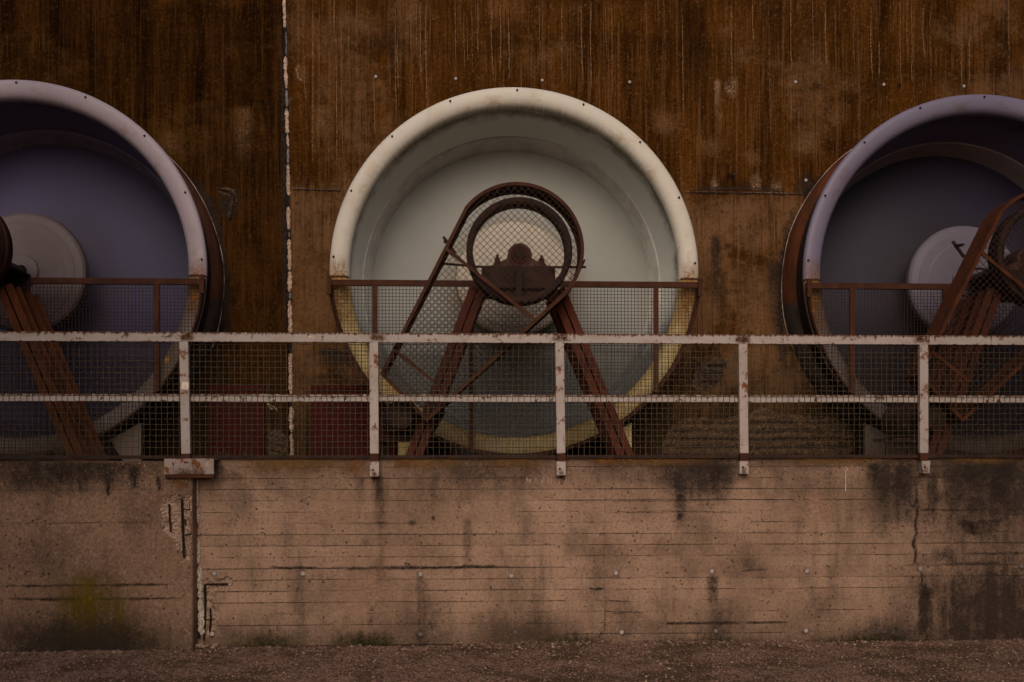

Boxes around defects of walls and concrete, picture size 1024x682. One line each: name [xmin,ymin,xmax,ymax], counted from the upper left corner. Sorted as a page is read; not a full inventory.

spalling [0,461,194,563]
crack [910,487,1022,601]
leakage [928,446,1024,533]
spalling [203,575,236,641]
leakage [918,548,1024,641]